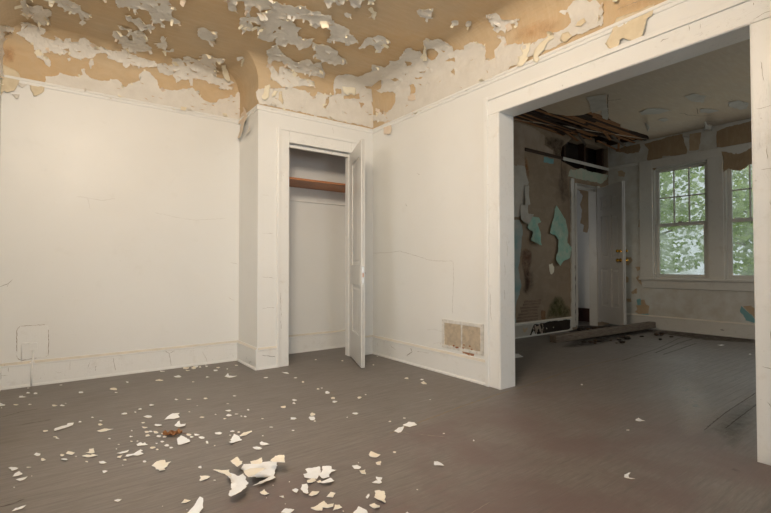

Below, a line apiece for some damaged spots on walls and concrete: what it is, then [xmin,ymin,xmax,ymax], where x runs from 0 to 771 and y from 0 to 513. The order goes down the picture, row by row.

peeling [0,0,247,139]
peeling [224,0,618,135]
spalling [616,132,701,170]
spalling [716,121,752,147]
spalling [568,168,608,233]